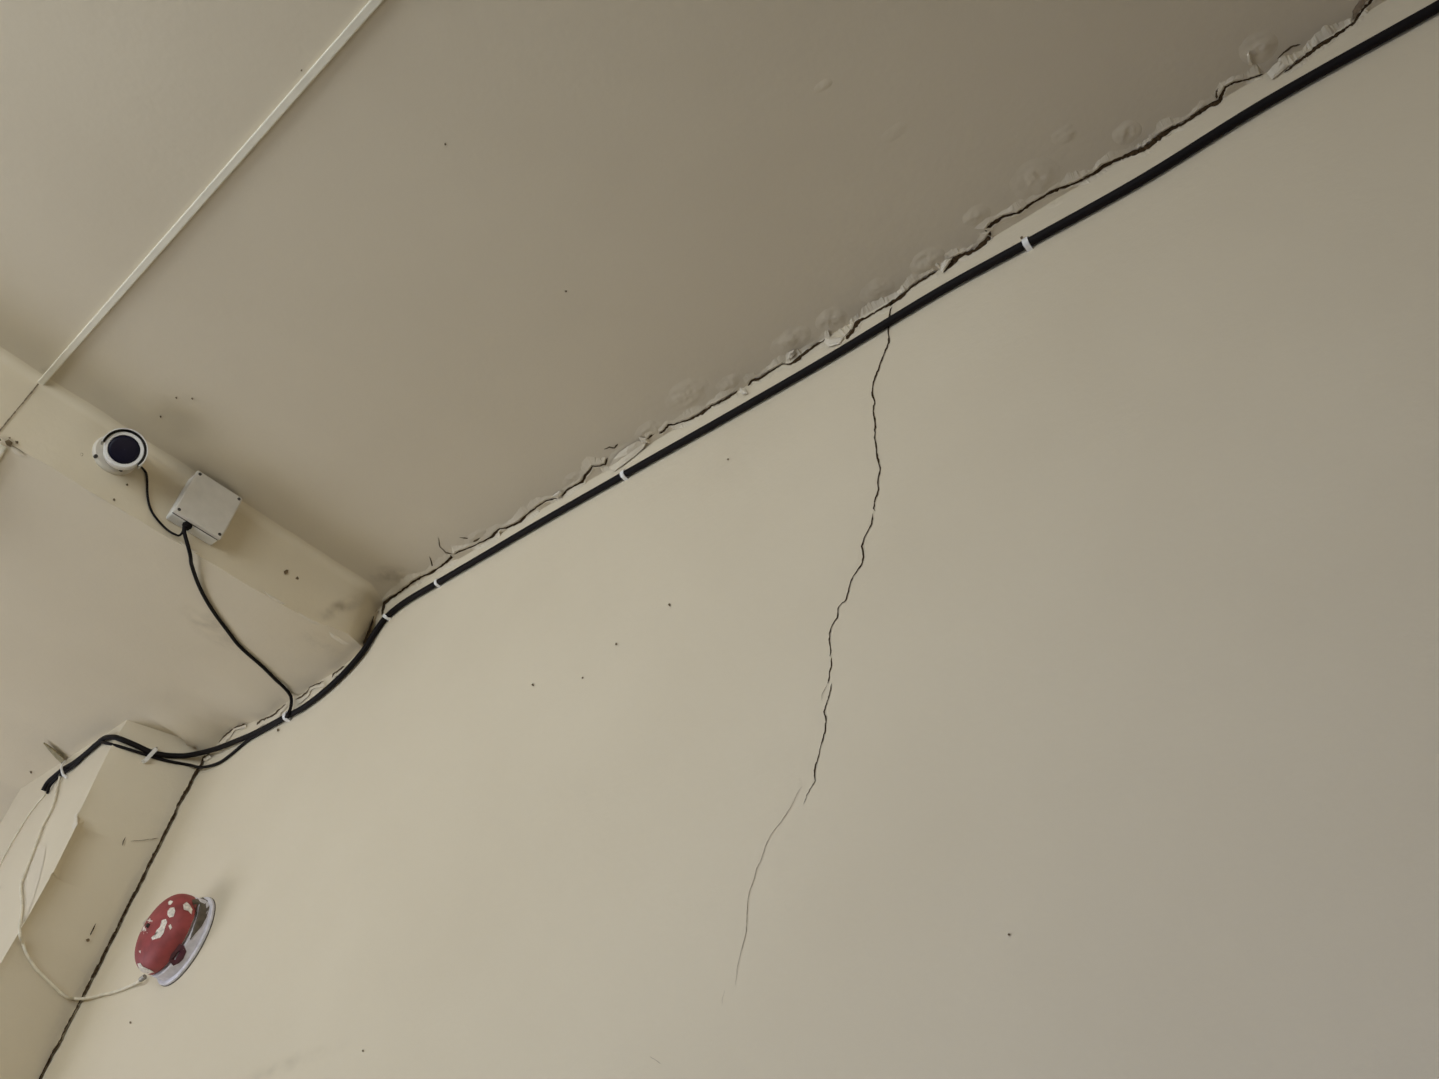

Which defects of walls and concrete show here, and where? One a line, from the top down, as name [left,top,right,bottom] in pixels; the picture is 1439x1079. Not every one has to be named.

crack [363,0,1376,999]